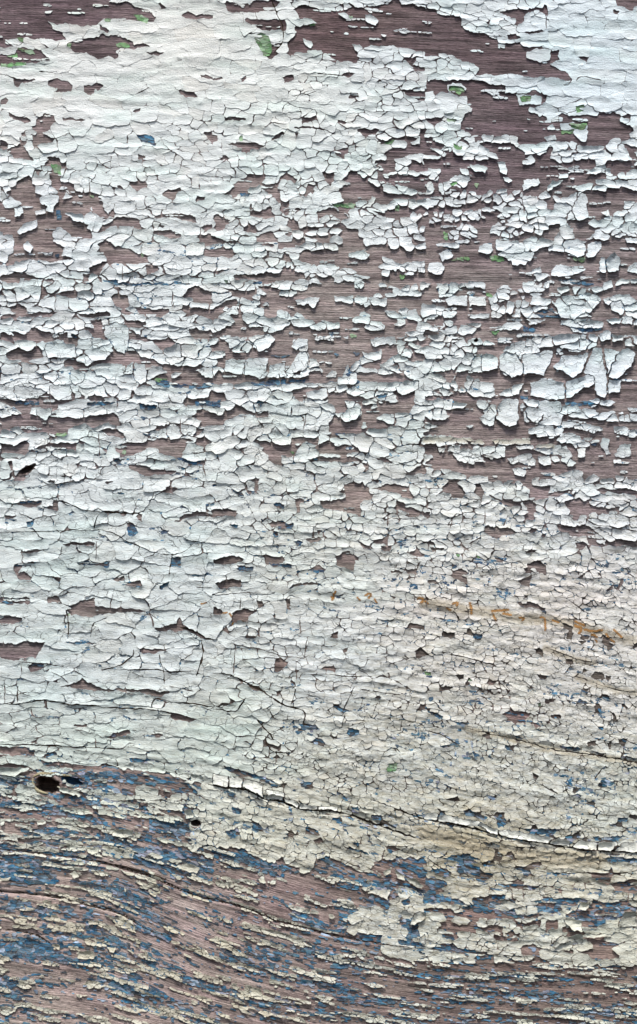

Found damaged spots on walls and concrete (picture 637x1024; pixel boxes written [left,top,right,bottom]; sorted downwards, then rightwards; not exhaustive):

crack [0,66,57,141]
crack [400,0,637,203]
peeling [0,0,637,586]
crack [459,267,637,355]
crack [378,306,603,466]
crack [0,817,169,902]
crack [0,884,232,1024]
crack [142,853,339,958]
crack [170,941,445,1024]
crack [304,875,637,995]
peeling [363,849,637,950]
crack [458,998,637,1024]